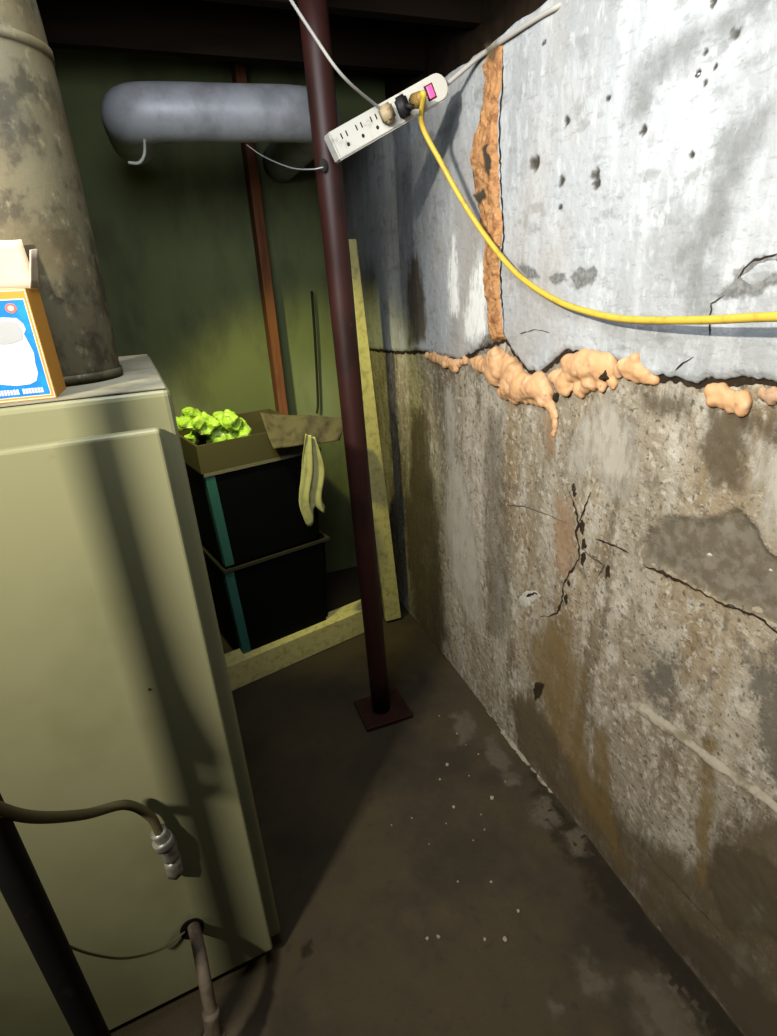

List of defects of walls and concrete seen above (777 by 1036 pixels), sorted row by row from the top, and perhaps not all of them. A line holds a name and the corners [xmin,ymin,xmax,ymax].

crack [369,42,777,452]
peeling [718,254,777,298]
crack [508,483,628,617]
spalling [644,512,777,633]
damp [450,711,521,786]
damp [644,653,679,712]
damp [750,646,777,779]
damp [513,696,777,1036]